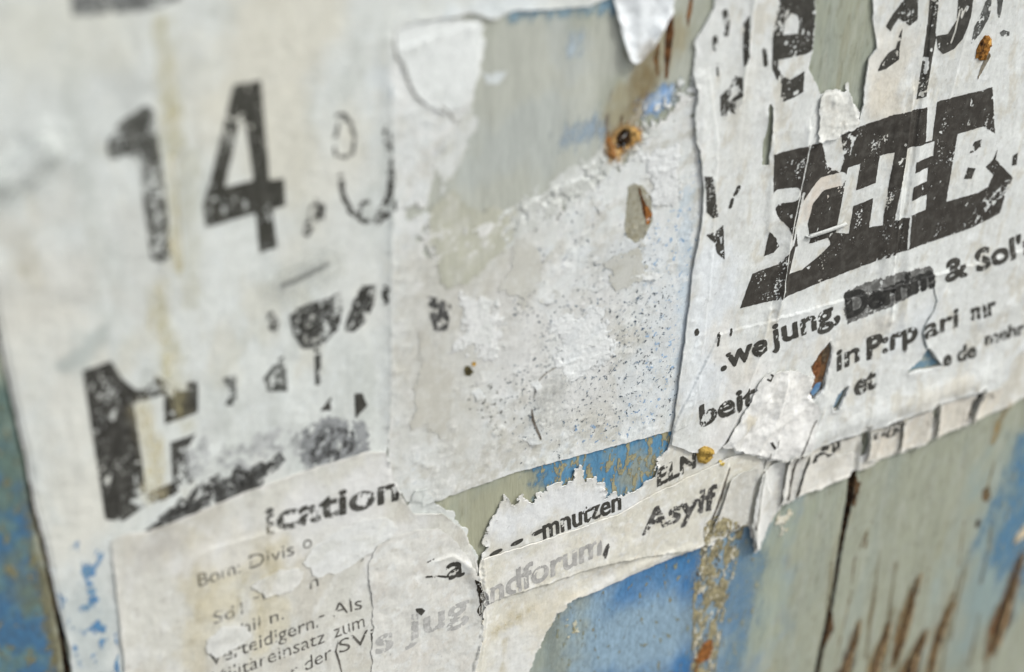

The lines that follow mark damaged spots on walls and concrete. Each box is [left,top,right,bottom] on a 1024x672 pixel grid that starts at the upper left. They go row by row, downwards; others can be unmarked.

rust [605,0,693,162]
rust [975,35,992,79]
peeling [548,515,747,672]
crack [815,470,930,672]